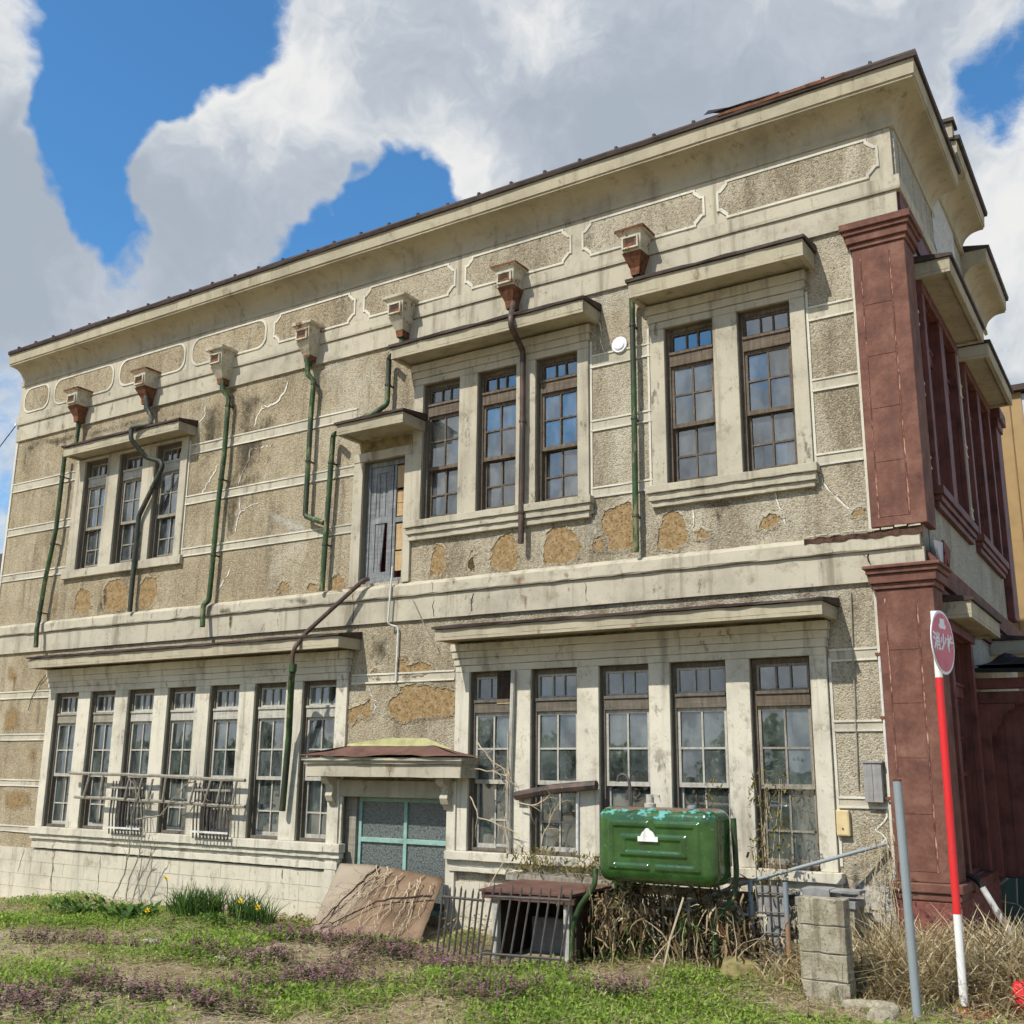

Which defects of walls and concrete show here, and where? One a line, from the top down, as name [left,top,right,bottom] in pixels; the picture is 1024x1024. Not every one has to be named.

crack [202,382,289,532]
flaking render [427,529,523,580]
flaking render [539,496,640,568]
flaking render [653,506,715,554]
flaking render [755,510,786,535]
flaking render [72,573,160,618]
flaking render [347,656,456,729]